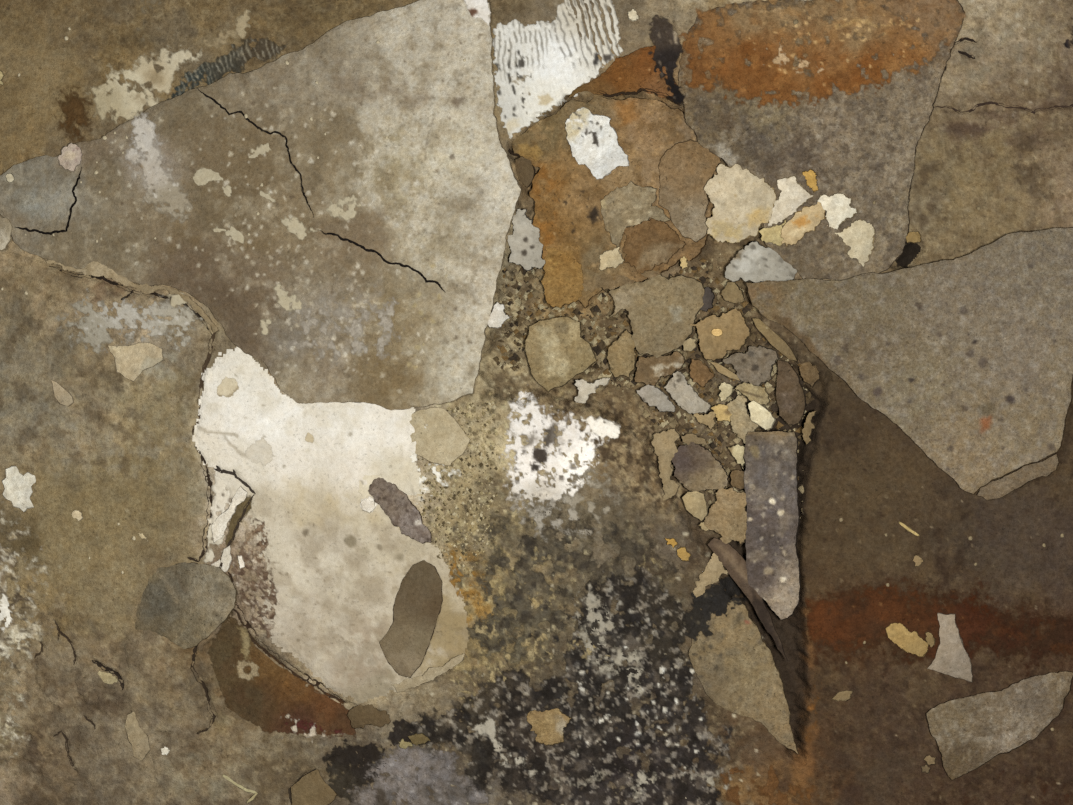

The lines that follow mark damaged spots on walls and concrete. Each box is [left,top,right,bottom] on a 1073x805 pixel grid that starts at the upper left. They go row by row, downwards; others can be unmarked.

spalling [628,8,685,104]
rust [680,0,966,108]
crack [197,88,446,293]
peeling [599,246,624,271]
flaking render [488,302,512,328]
flaking render [574,378,611,404]
flaking render [637,385,675,412]
peeling [728,444,745,470]
flaking render [192,346,470,703]
peeling [665,538,691,561]
leakage [400,391,747,805]
rust [806,577,1073,670]